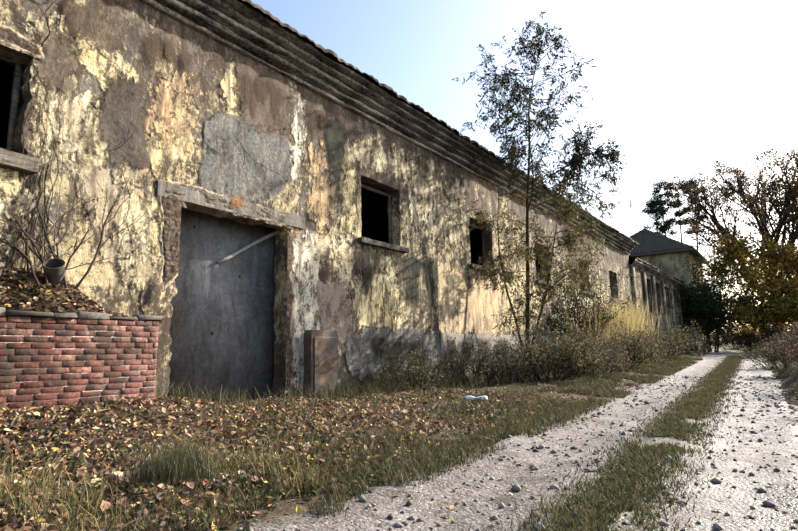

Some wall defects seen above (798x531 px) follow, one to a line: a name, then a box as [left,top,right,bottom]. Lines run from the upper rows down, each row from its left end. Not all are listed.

flaking render [0,0,604,394]
damp [353,249,381,297]
damp [396,254,438,318]
damp [373,336,426,365]
damp [448,338,507,368]